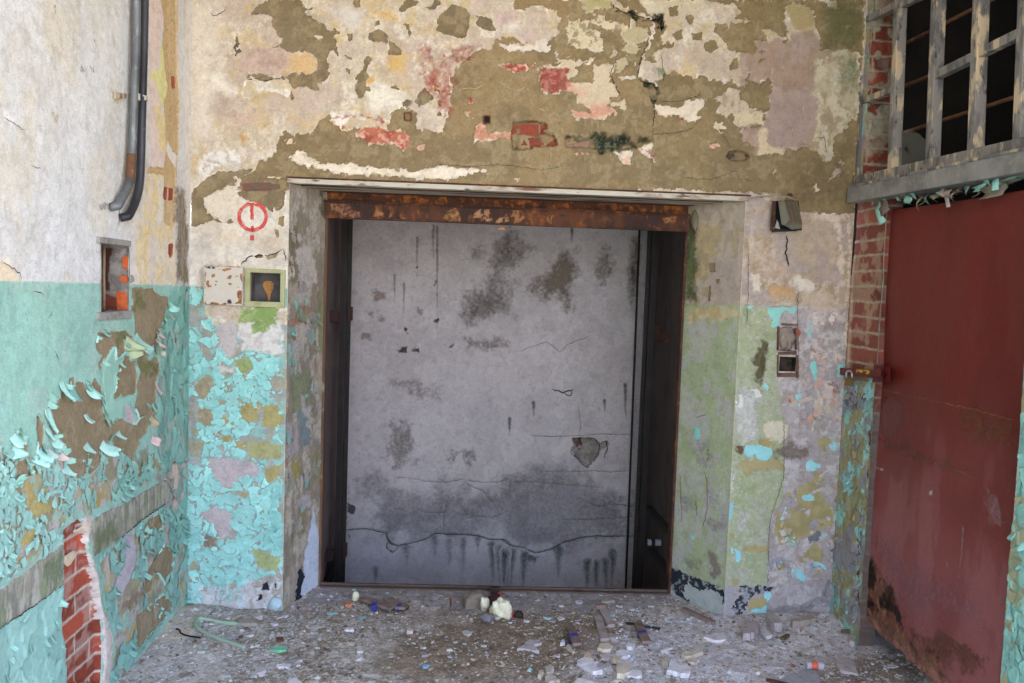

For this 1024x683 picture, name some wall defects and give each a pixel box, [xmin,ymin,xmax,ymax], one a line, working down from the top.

damp [463,231,522,322]
corrosion [287,176,751,224]
damp [532,253,575,308]
flaking render [190,0,1024,623]
peeling [0,253,322,683]
crack [350,389,634,553]
damp [381,467,616,576]
corrosion [856,515,978,683]